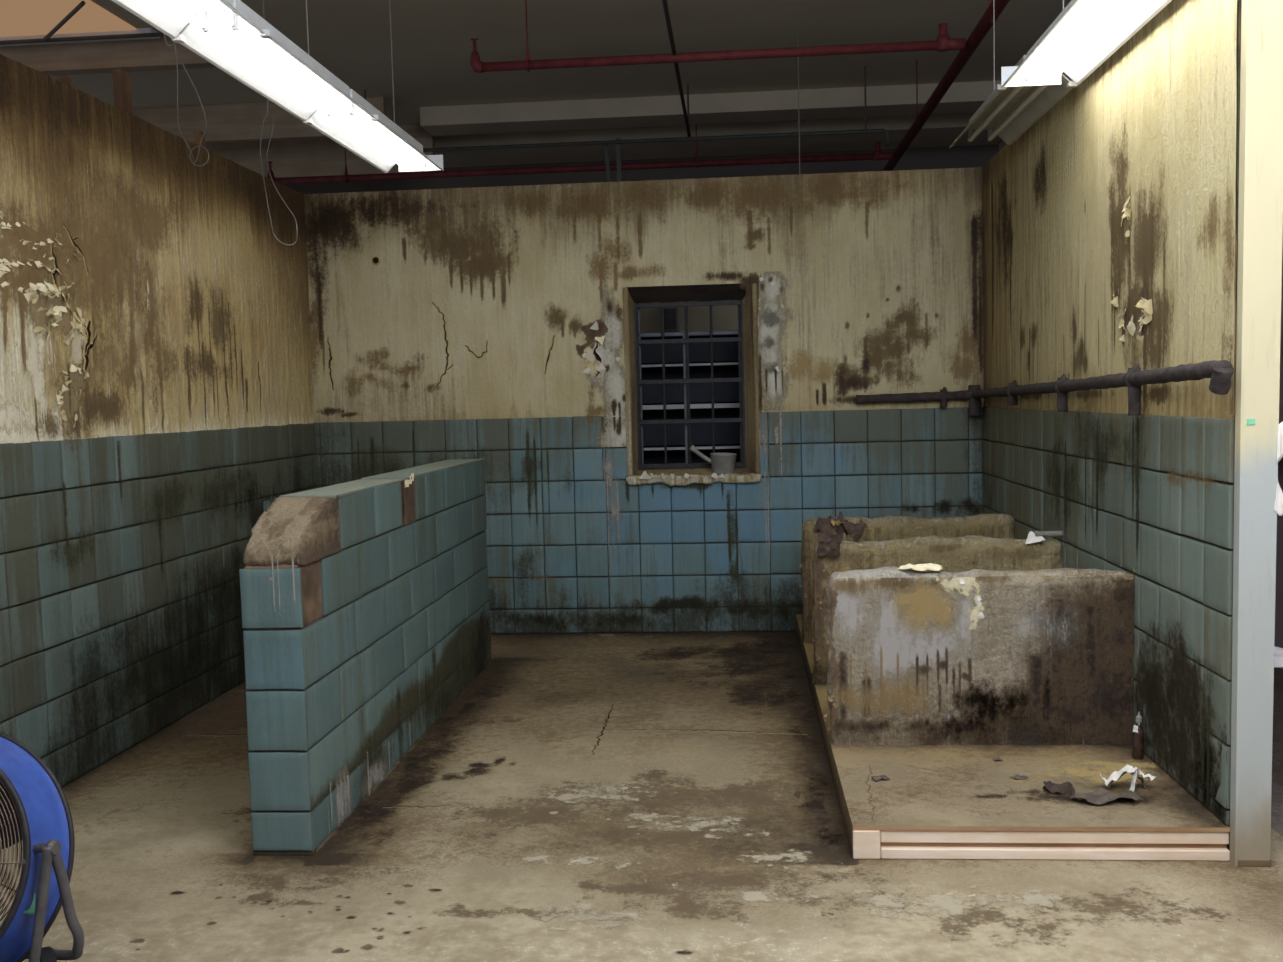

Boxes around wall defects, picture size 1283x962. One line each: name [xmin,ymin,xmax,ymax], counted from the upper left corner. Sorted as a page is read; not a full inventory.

peeling [0,210,89,428]
leakage [402,209,518,306]
crack [432,301,488,392]
flaking render [576,284,626,447]
flaking render [758,271,792,411]
leakage [816,285,938,405]
leakage [1068,125,1174,555]
peeling [1110,283,1153,347]
spalling [243,495,342,626]
leakage [506,483,1227,819]
spalling [936,577,984,630]
leakage [442,756,515,780]